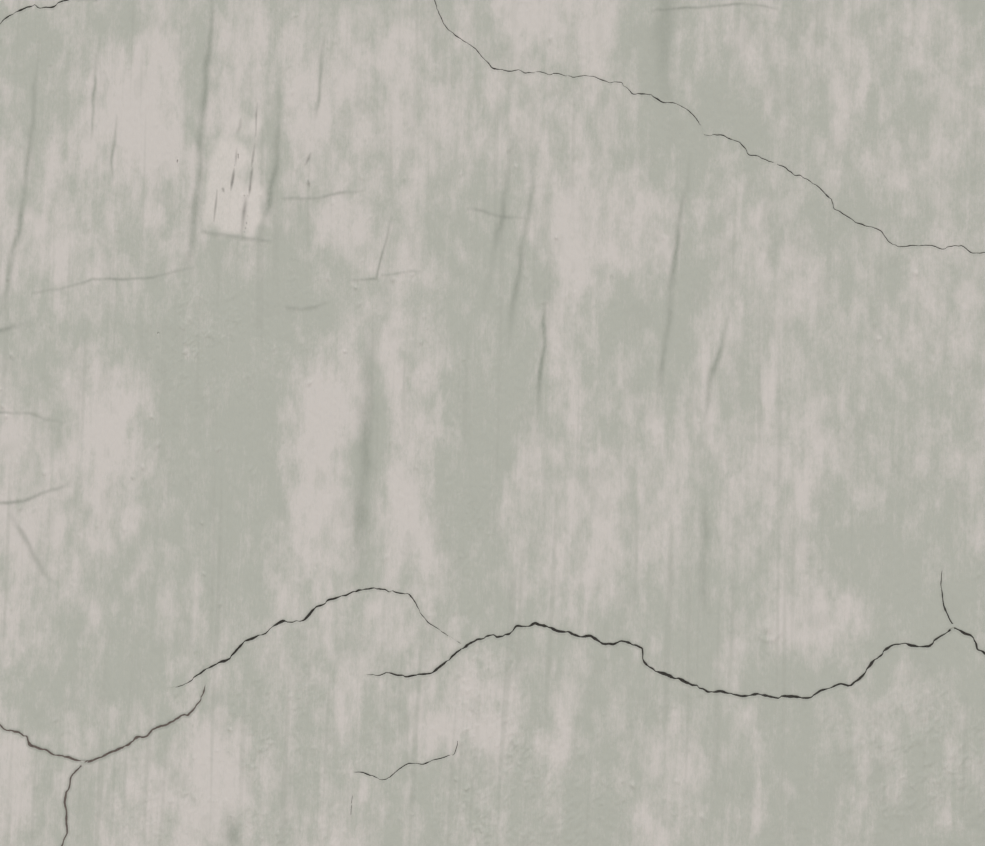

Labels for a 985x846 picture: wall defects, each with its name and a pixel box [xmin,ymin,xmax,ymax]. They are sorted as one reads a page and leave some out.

crack [0,0,103,27]
crack [432,0,985,256]
crack [280,188,366,202]
crack [201,228,275,244]
crack [346,215,394,283]
crack [0,566,985,846]